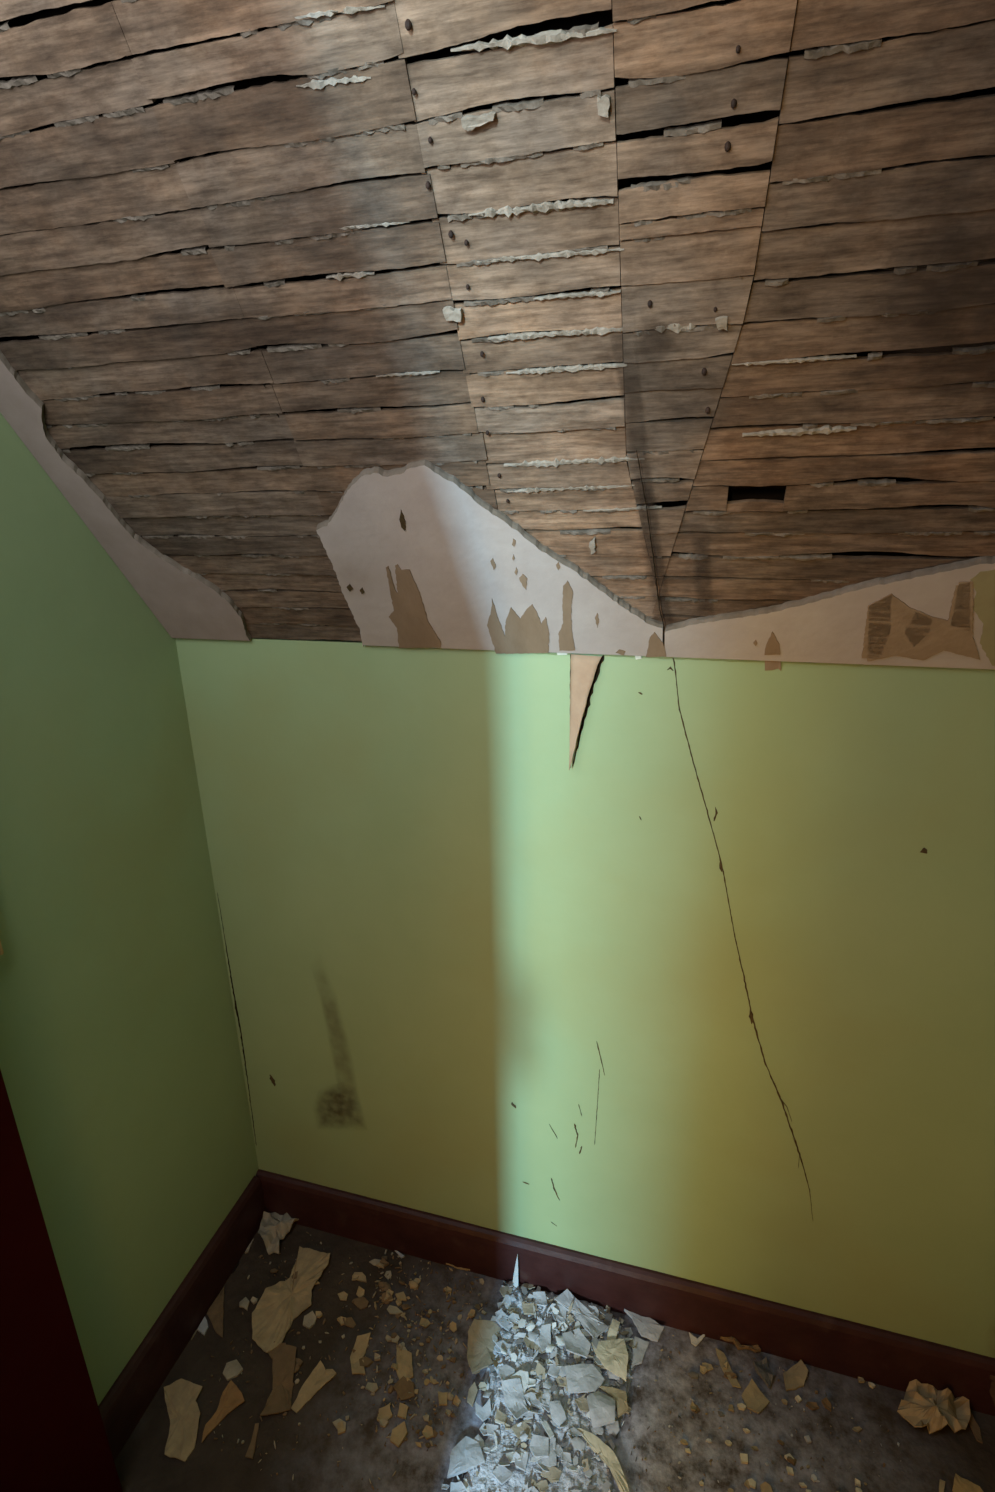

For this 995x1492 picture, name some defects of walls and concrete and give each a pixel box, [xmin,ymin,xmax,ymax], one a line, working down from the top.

peeling [386,564,441,648]
peeling [487,539,666,770]
peeling [862,581,980,661]
crack [636,450,813,1219]